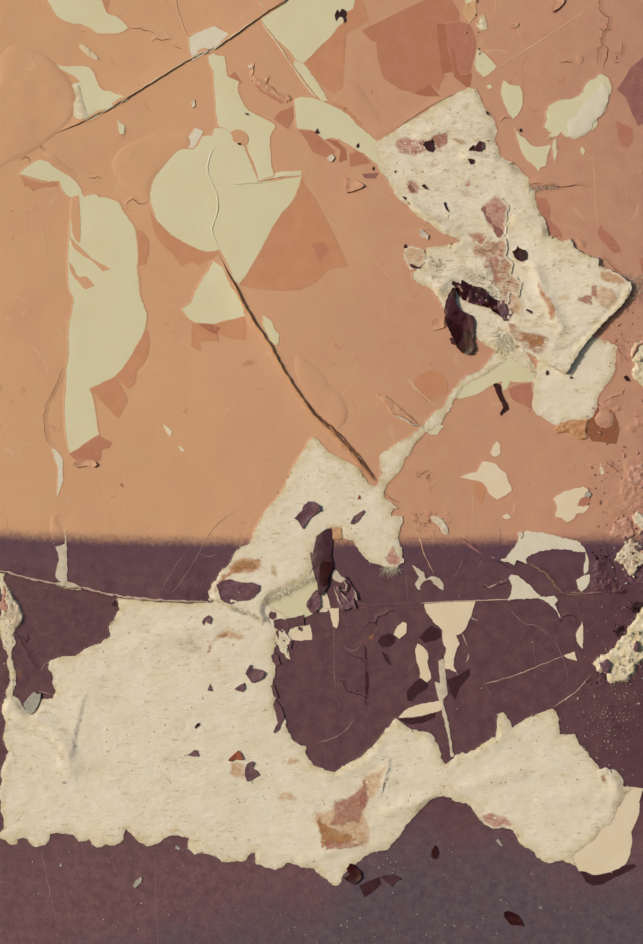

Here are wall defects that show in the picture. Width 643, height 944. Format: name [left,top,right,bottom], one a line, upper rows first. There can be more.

peeling [466,48,559,173]
peeling [149,0,396,324]
peeling [512,246,527,261]
peeling [18,158,148,498]
peeling [431,276,513,355]
crack [306,401,375,479]
peeling [294,501,321,529]
peeling [216,579,260,604]
peeling [267,528,358,641]
peeling [490,529,590,619]
peeling [398,564,476,758]
peeling [573,787,643,875]